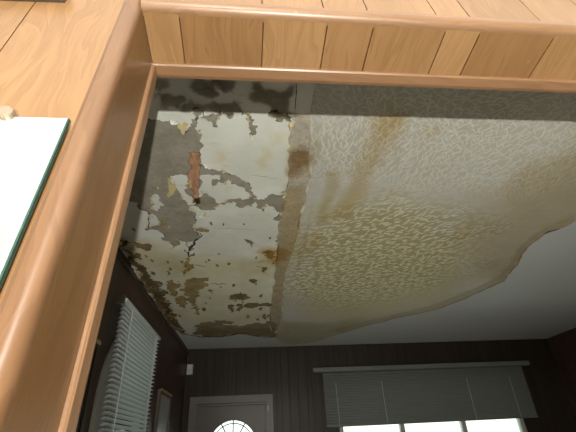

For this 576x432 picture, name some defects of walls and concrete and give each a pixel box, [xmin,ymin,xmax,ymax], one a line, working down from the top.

crack [187,227,208,267]
peeling [118,107,311,337]